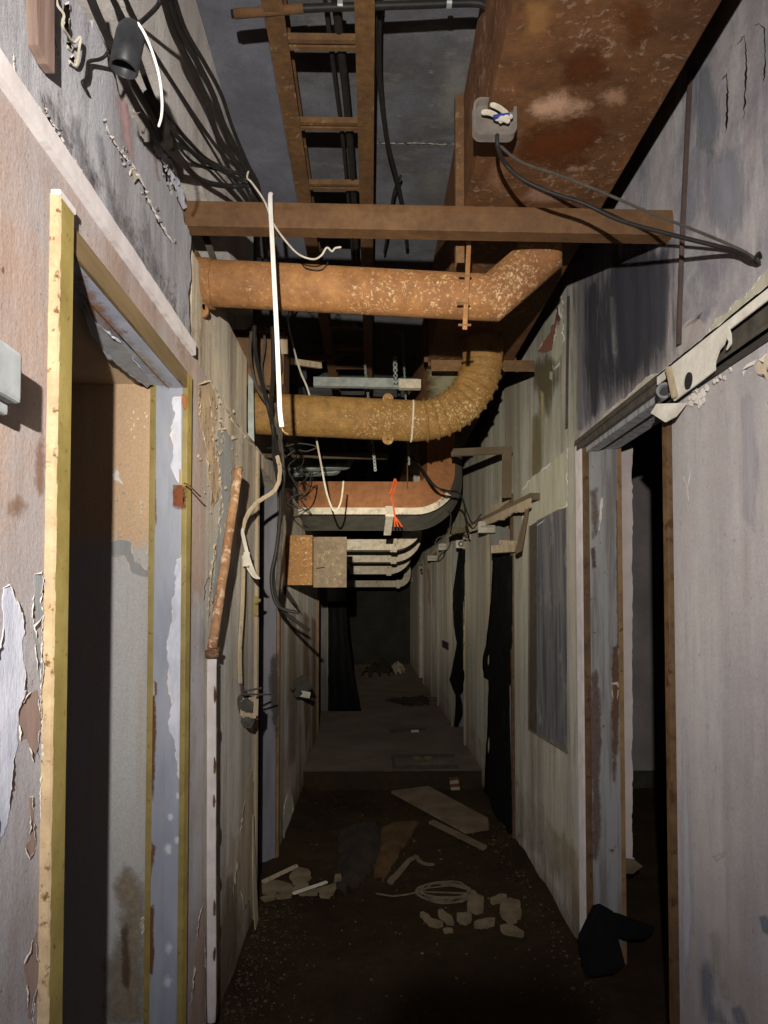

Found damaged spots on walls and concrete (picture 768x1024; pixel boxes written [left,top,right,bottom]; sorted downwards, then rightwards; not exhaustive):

peeling [537,296,565,370]
peeling [687,353,768,408]
peeling [170,397,181,483]
peeling [197,380,237,621]
peeling [0,572,45,840]
peeling [166,558,181,778]
peeling [25,796,36,860]
peeling [23,933,40,1019]
leakage [104,869,144,1024]